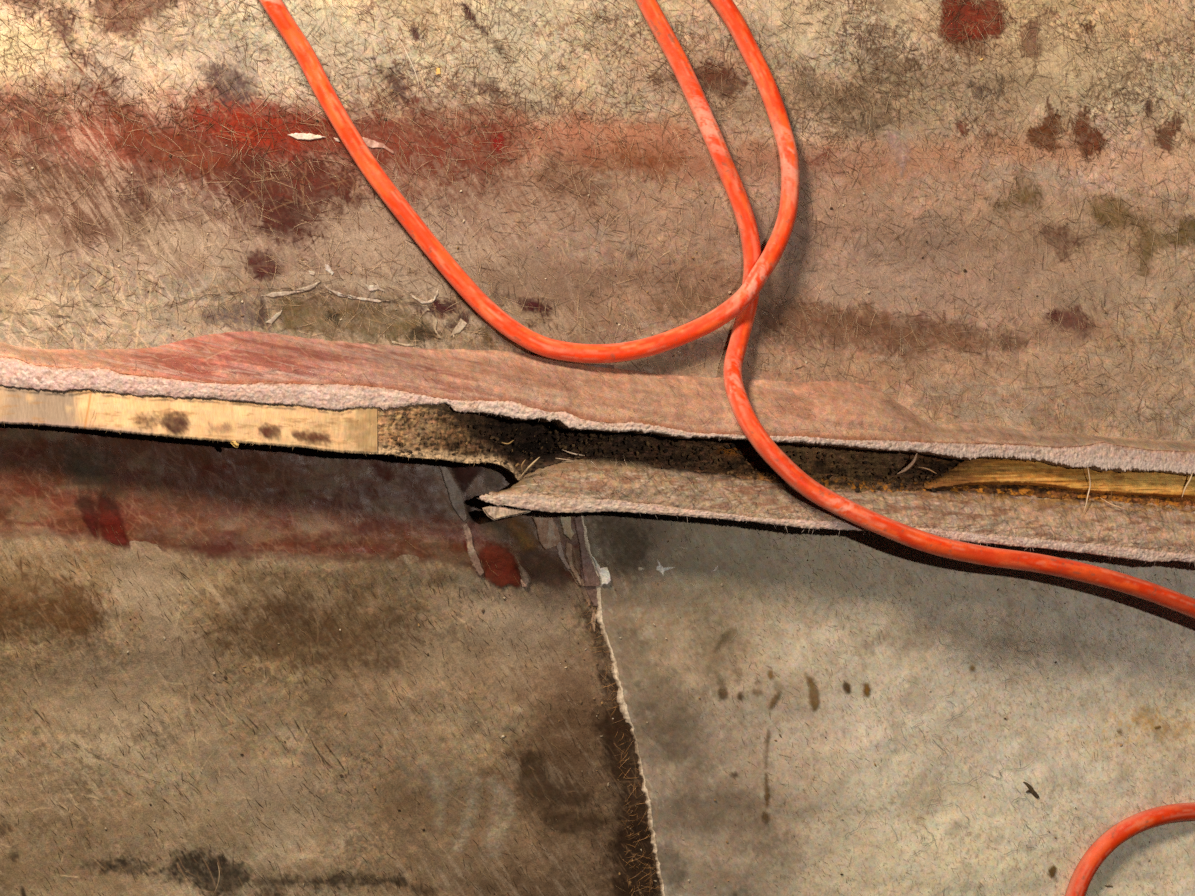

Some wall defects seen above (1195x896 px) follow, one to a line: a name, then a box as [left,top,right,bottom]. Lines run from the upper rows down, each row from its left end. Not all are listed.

peeling [260,264,390,324]
peeling [438,464,611,633]
water stain [0,561,102,642]
water stain [718,682,759,699]
water stain [807,678,819,710]
water stain [843,682,870,697]
water stain [579,605,686,896]
water stain [454,751,602,850]
water stain [101,848,249,896]
water stain [312,871,433,896]